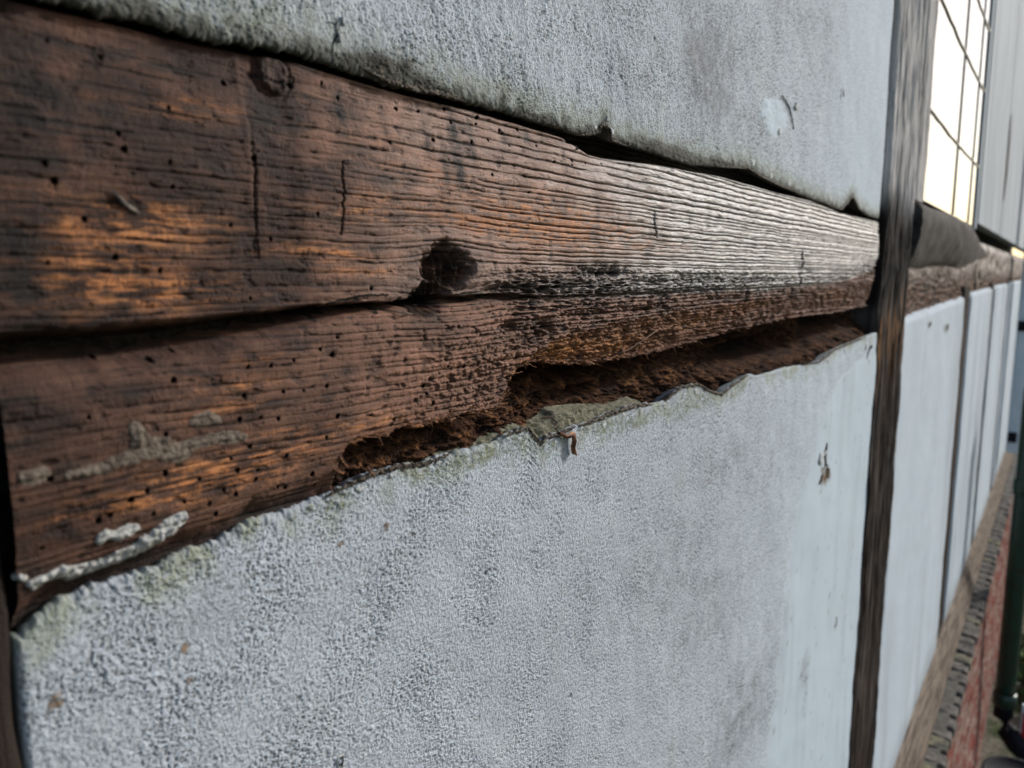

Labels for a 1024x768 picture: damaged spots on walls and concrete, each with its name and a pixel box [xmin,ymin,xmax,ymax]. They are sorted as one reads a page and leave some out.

peeling [758,95,798,139]
spalling [505,375,748,446]
spalling [818,443,831,484]